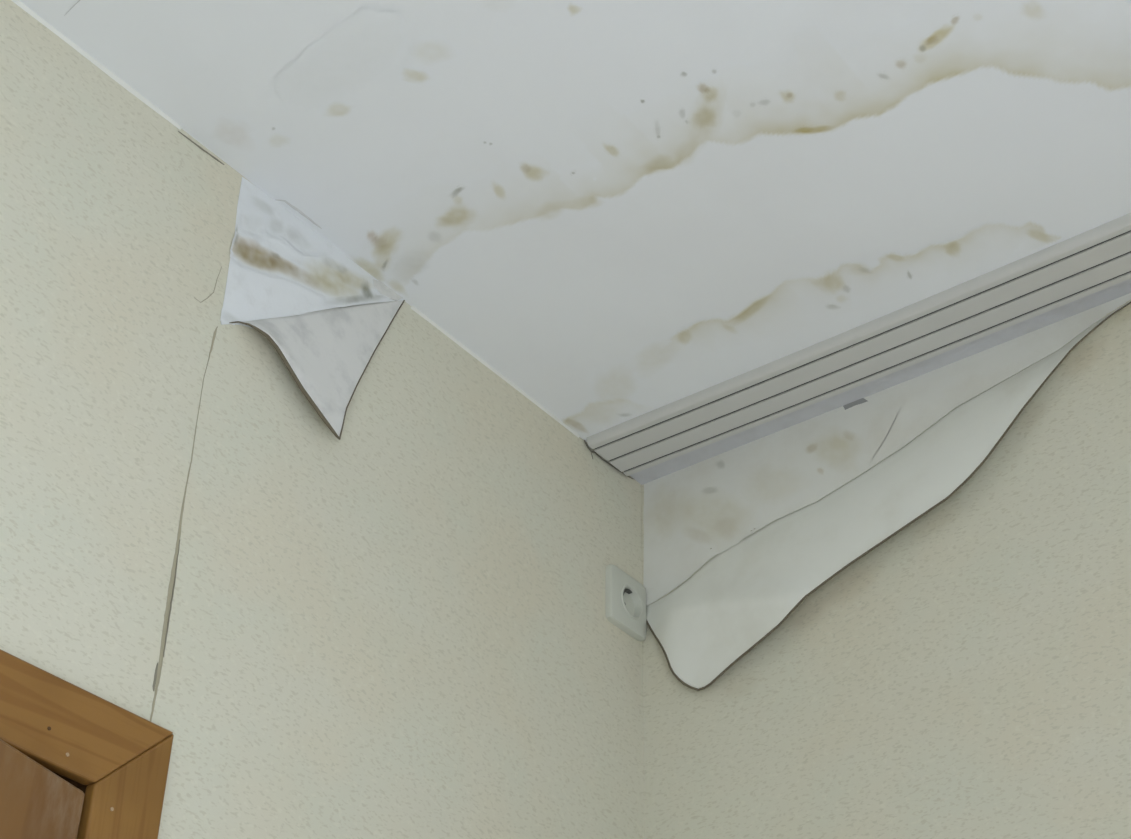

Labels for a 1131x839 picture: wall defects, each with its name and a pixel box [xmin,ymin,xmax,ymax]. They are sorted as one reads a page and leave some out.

leakage [230,0,1131,307]
flaking render [220,257,338,329]
flaking render [234,177,403,306]
leakage [560,220,1063,440]
leakage [1052,300,1131,383]
crack [150,326,218,722]
leakage [783,558,889,634]